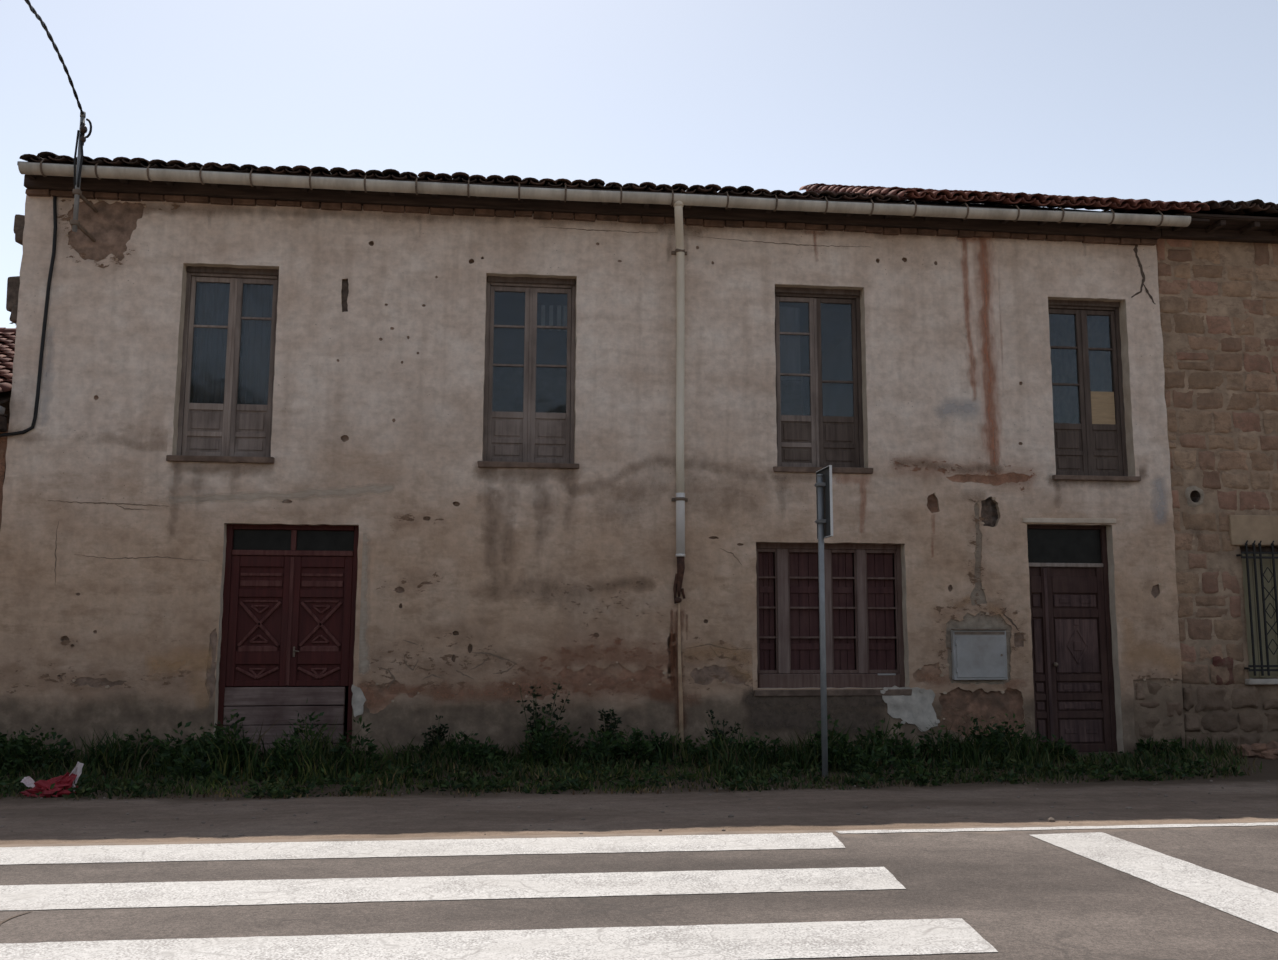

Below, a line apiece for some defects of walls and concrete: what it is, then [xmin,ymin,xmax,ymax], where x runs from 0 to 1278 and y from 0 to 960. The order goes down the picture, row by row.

spalling [58,199,180,268]
crack [1131,245,1155,304]
corrosion [962,237,996,463]
spalling [880,458,1035,737]
spalling [362,631,530,714]
spalling [681,637,752,690]